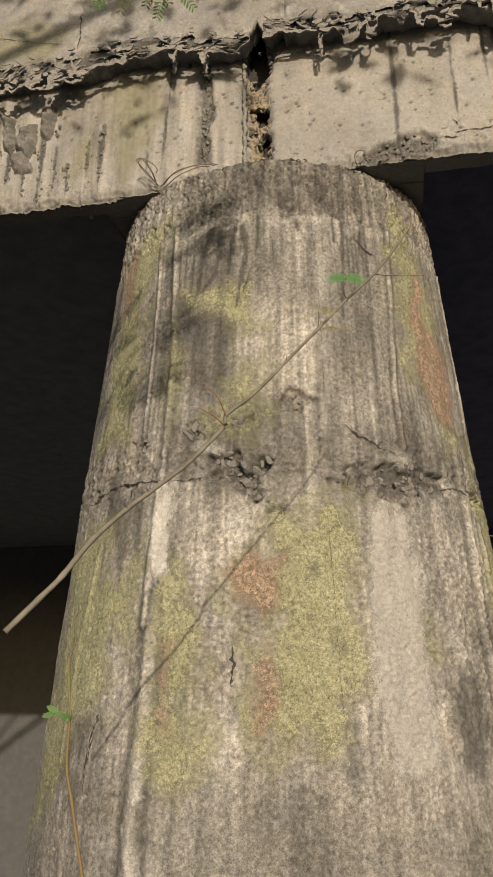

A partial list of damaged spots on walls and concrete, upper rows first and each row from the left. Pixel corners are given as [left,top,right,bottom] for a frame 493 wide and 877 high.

peeling [262,0,493,50]
peeling [0,26,250,164]
spalling [363,134,438,164]
crack [311,224,400,459]
corrosion [410,278,451,426]
corrosion [231,553,277,609]
crack [228,647,236,687]